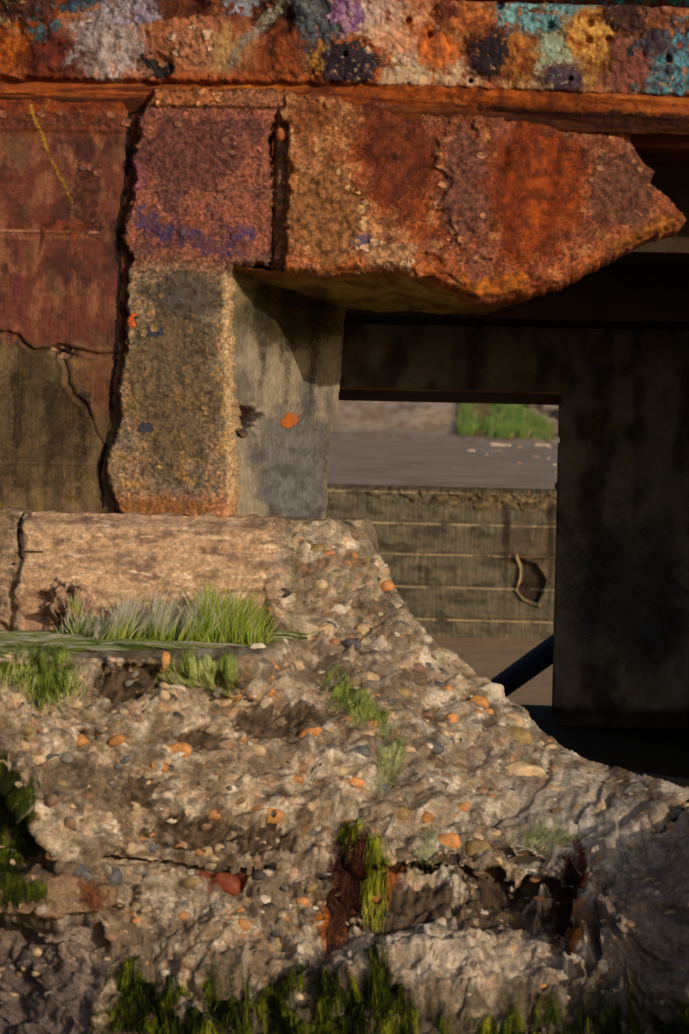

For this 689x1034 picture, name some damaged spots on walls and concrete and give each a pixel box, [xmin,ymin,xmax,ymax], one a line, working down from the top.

corrosion [147,0,217,25]
corrosion [0,22,98,81]
corrosion [261,20,332,83]
corrosion [334,1,689,298]
crack [11,512,43,565]
crack [103,854,293,874]
crack [379,861,448,874]